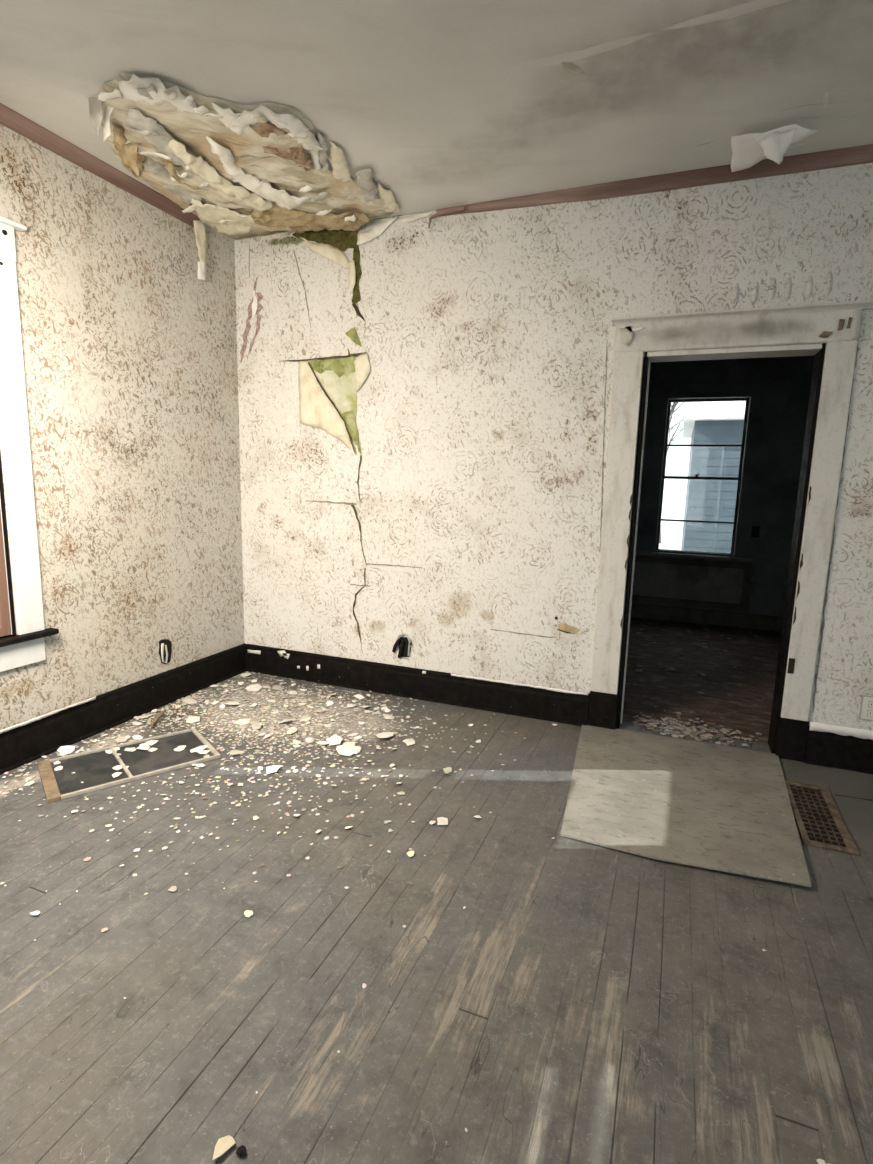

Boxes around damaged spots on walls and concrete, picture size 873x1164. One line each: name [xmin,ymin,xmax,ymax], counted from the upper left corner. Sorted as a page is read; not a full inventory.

crack [482,0,793,76]
peeling [88,72,436,362]
leakage [272,236,305,245]
crack [306,455,421,641]